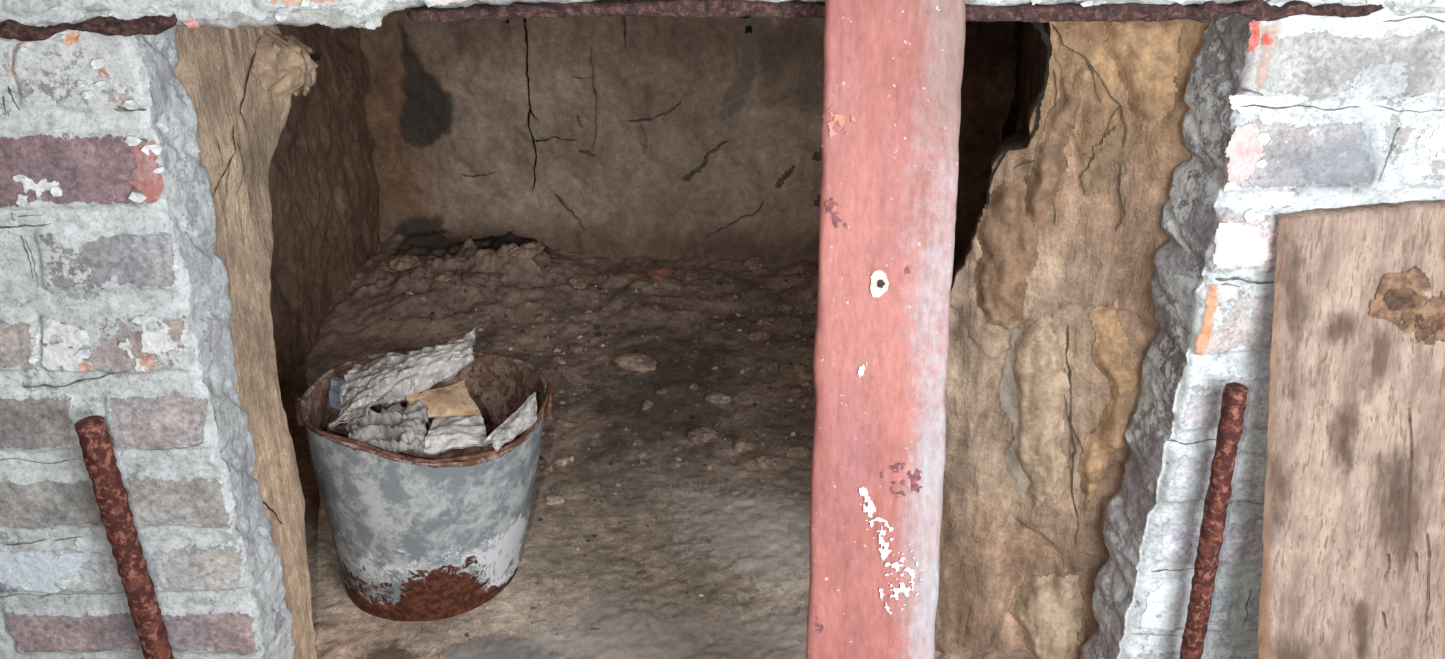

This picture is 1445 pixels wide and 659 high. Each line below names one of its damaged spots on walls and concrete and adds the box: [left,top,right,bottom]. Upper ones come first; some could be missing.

water stain [399,26,453,154]
crack [523,15,627,191]